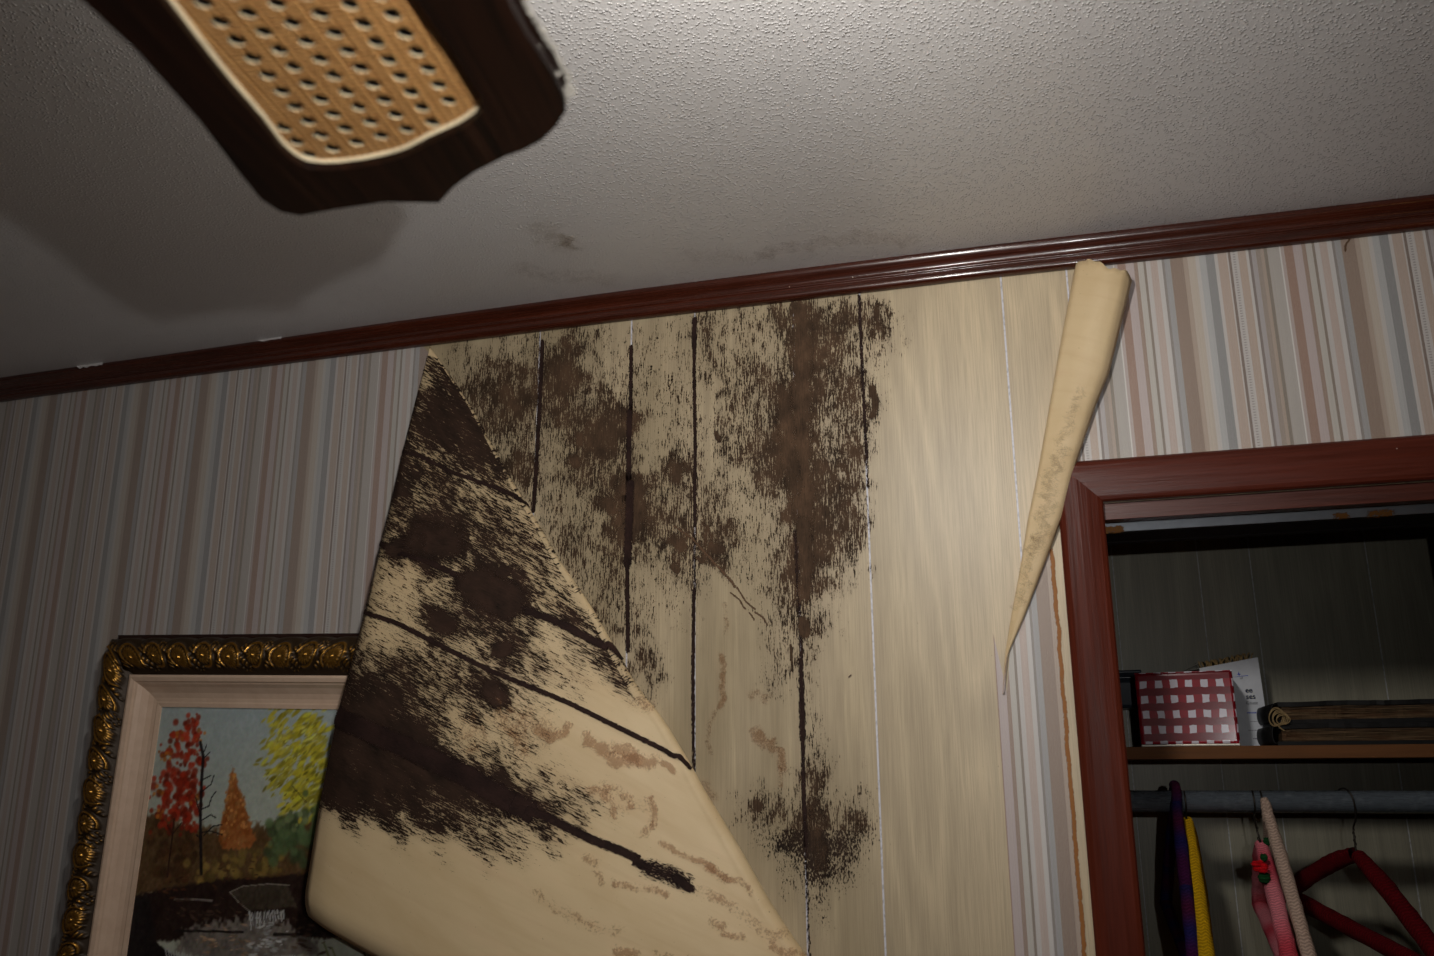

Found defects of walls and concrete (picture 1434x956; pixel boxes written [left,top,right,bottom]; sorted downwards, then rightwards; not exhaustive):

peeling [305,347,806,956]
leakage [319,294,907,956]